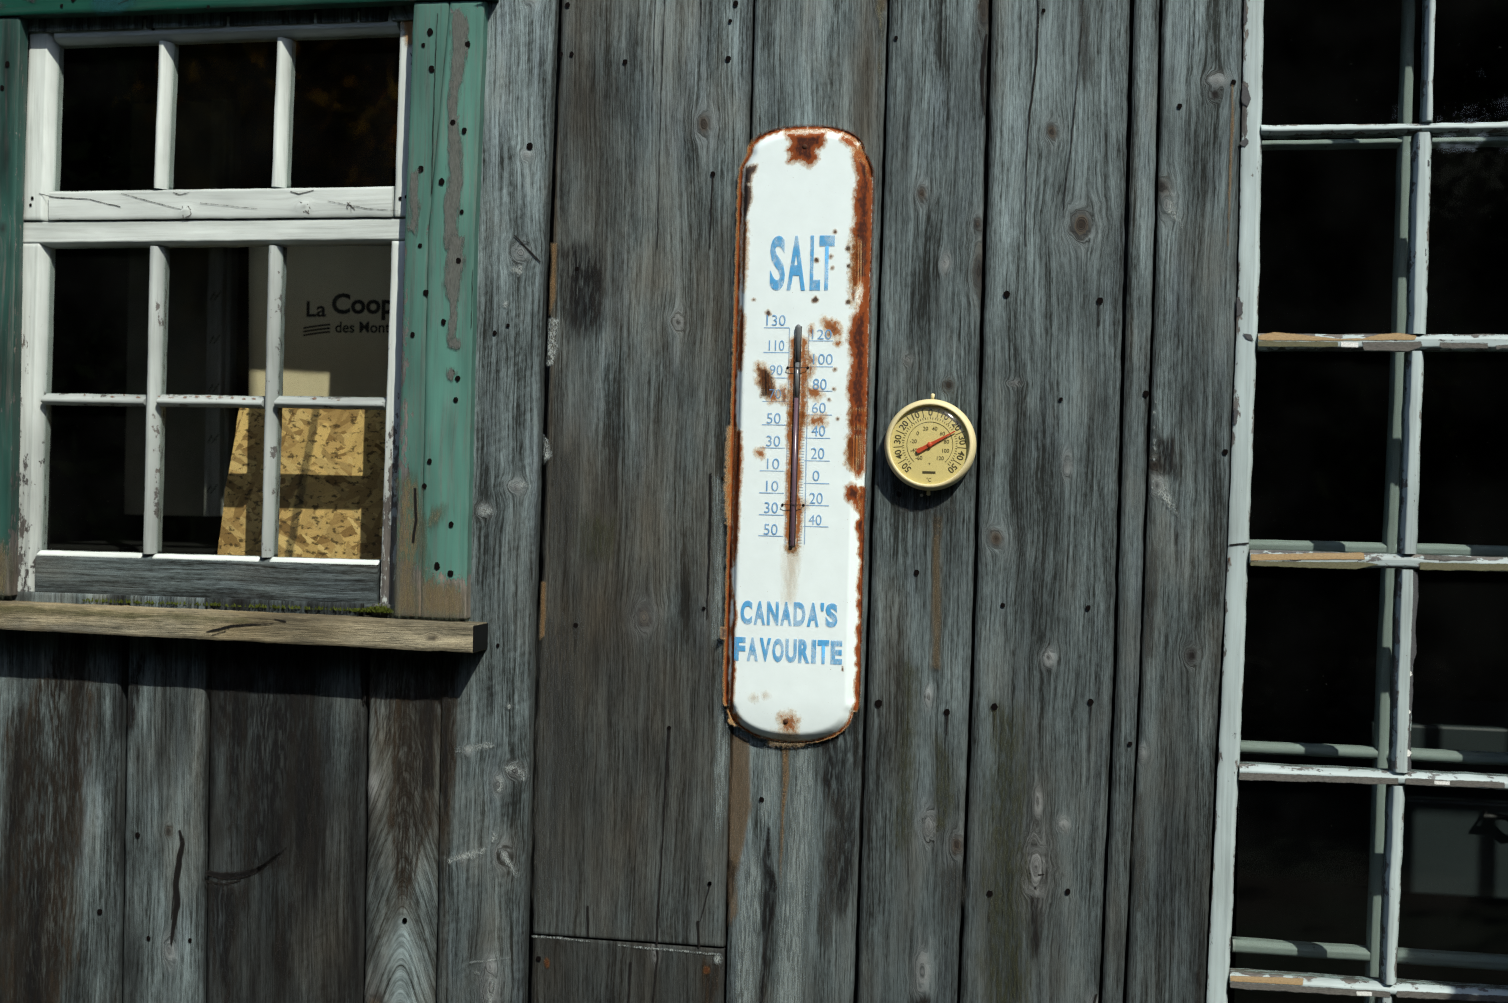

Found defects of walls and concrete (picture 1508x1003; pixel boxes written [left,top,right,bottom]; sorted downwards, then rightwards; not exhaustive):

peeling [1241,84,1251,106]
peeling [443,9,469,381]
peeling [1243,332,1422,351]
corrosion [721,125,874,874]
peeling [1250,552,1378,569]
peeling [1239,555,1508,788]
peeling [1230,976,1508,1003]